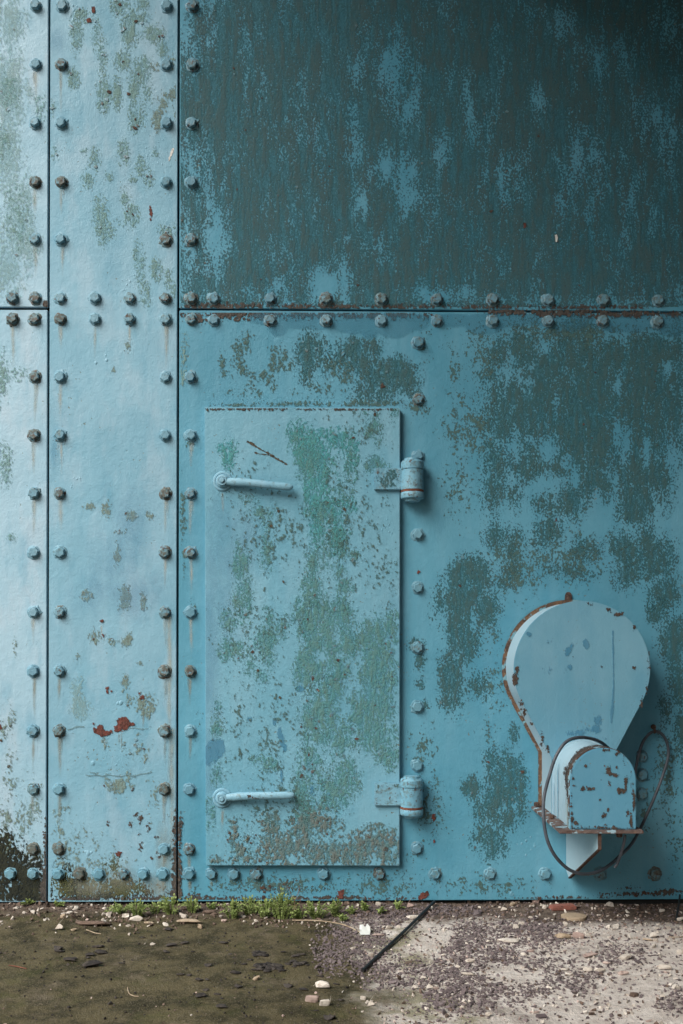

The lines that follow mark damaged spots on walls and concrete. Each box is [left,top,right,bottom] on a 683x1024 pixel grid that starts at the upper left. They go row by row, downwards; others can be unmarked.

rust [180,301,683,325]
peeling [66,0,683,875]
rust [208,408,397,842]
rust [93,717,135,737]
rust [0,784,683,901]
rust [563,745,645,830]